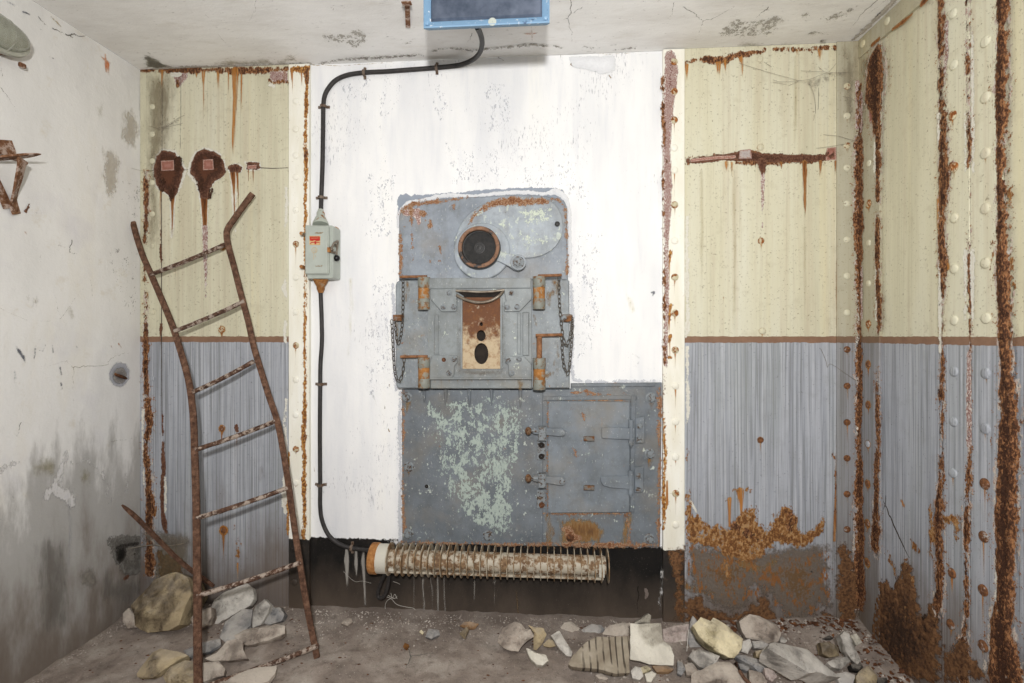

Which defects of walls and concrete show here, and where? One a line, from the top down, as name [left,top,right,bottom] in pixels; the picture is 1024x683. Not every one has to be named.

water stain [43,451,91,509]
rust [140,65,310,580]
rust [398,0,1024,683]